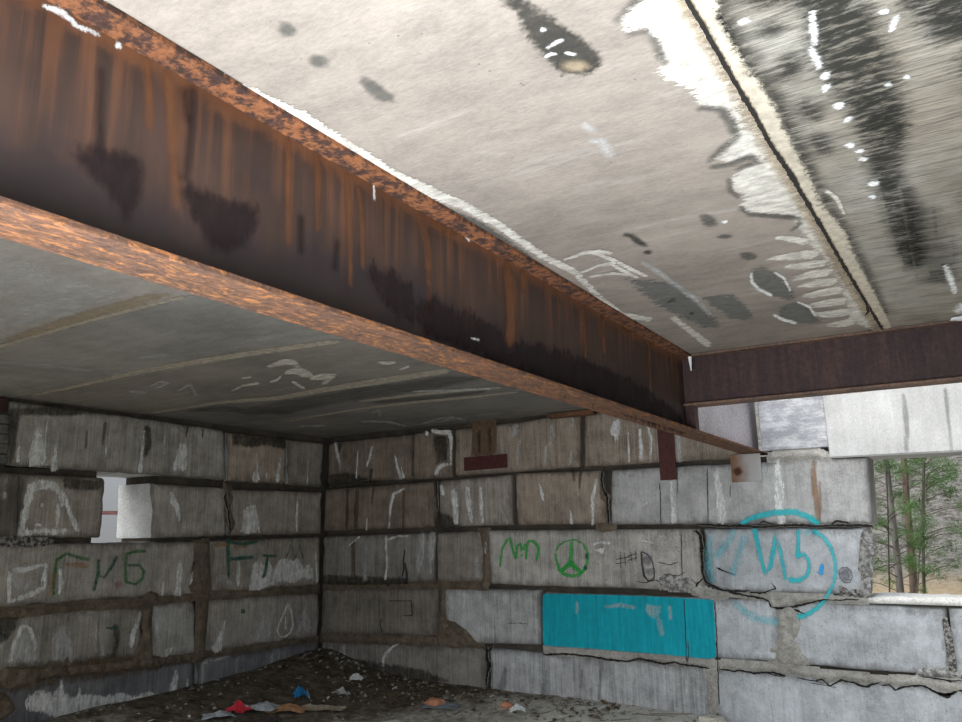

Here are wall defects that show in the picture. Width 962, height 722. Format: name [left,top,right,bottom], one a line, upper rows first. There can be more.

water stain [506,0,600,77]
water stain [80,149,139,209]
water stain [185,185,259,249]
water stain [620,0,962,330]
spalling [436,589,485,648]
crack [543,467,962,705]